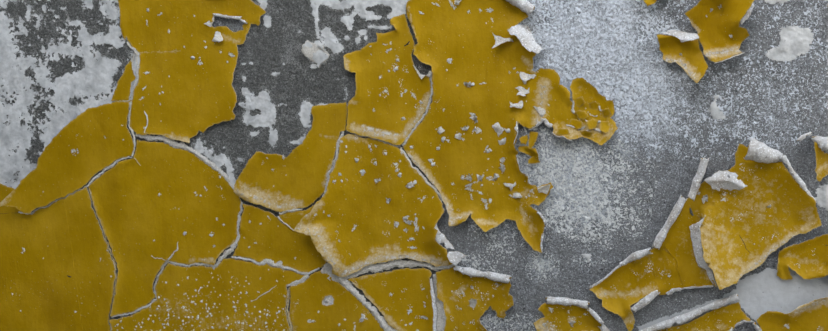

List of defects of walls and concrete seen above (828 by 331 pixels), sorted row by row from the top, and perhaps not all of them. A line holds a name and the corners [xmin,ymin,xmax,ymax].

flaking render [0,0,140,189]
crack [0,42,454,331]
flaking render [189,0,409,185]
flaking render [435,0,828,331]
peeling [430,274,446,331]